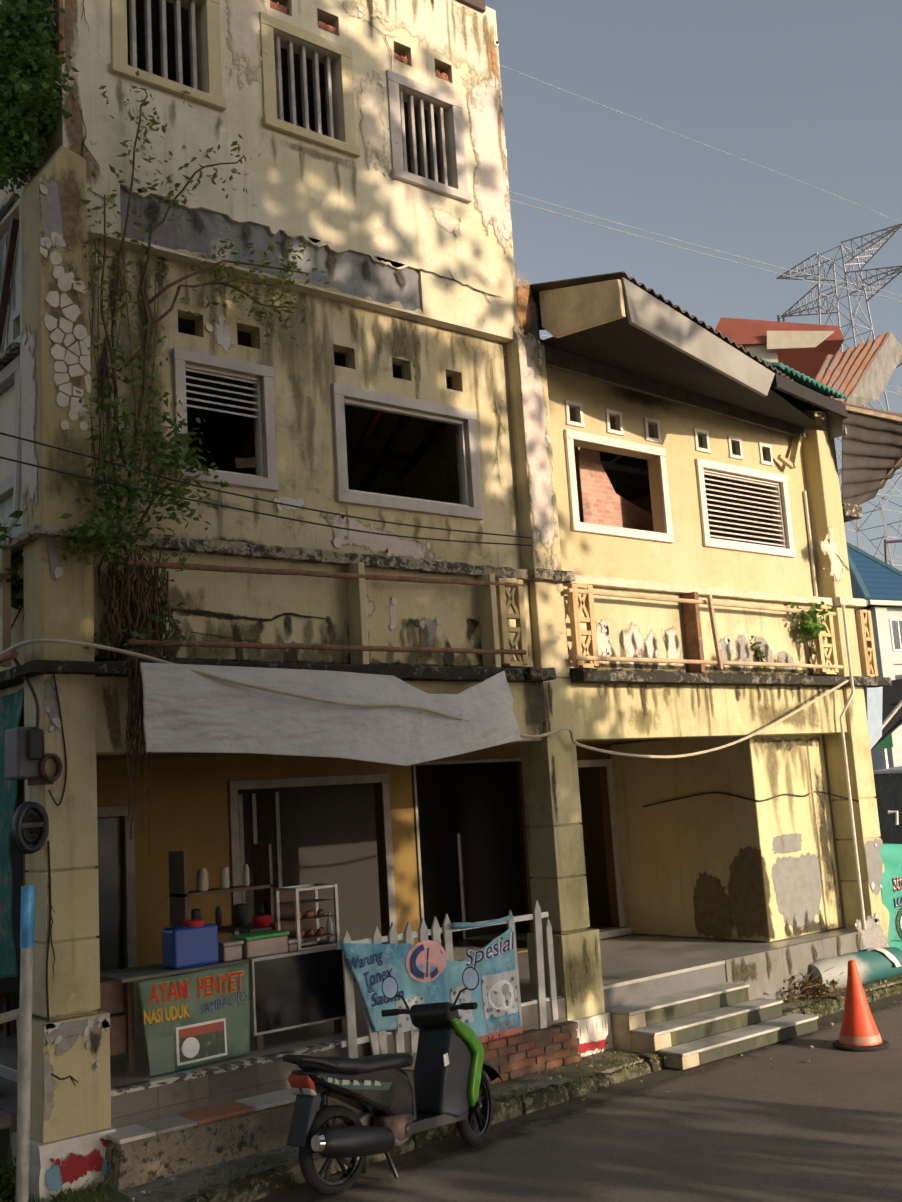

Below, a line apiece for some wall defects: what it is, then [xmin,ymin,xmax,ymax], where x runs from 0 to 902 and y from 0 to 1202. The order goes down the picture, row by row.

spalling [318,21,336,35]
leakage [367,0,397,28]
leakage [413,0,489,54]
peeling [342,0,513,254]
spalling [120,185,424,315]
peeling [517,322,560,590]
peeling [320,512,443,561]
leakage [369,618,483,667]
leakage [529,681,553,741]
leakage [598,683,714,734]
leakage [694,686,841,983]
spalling [44,1014,111,1120]